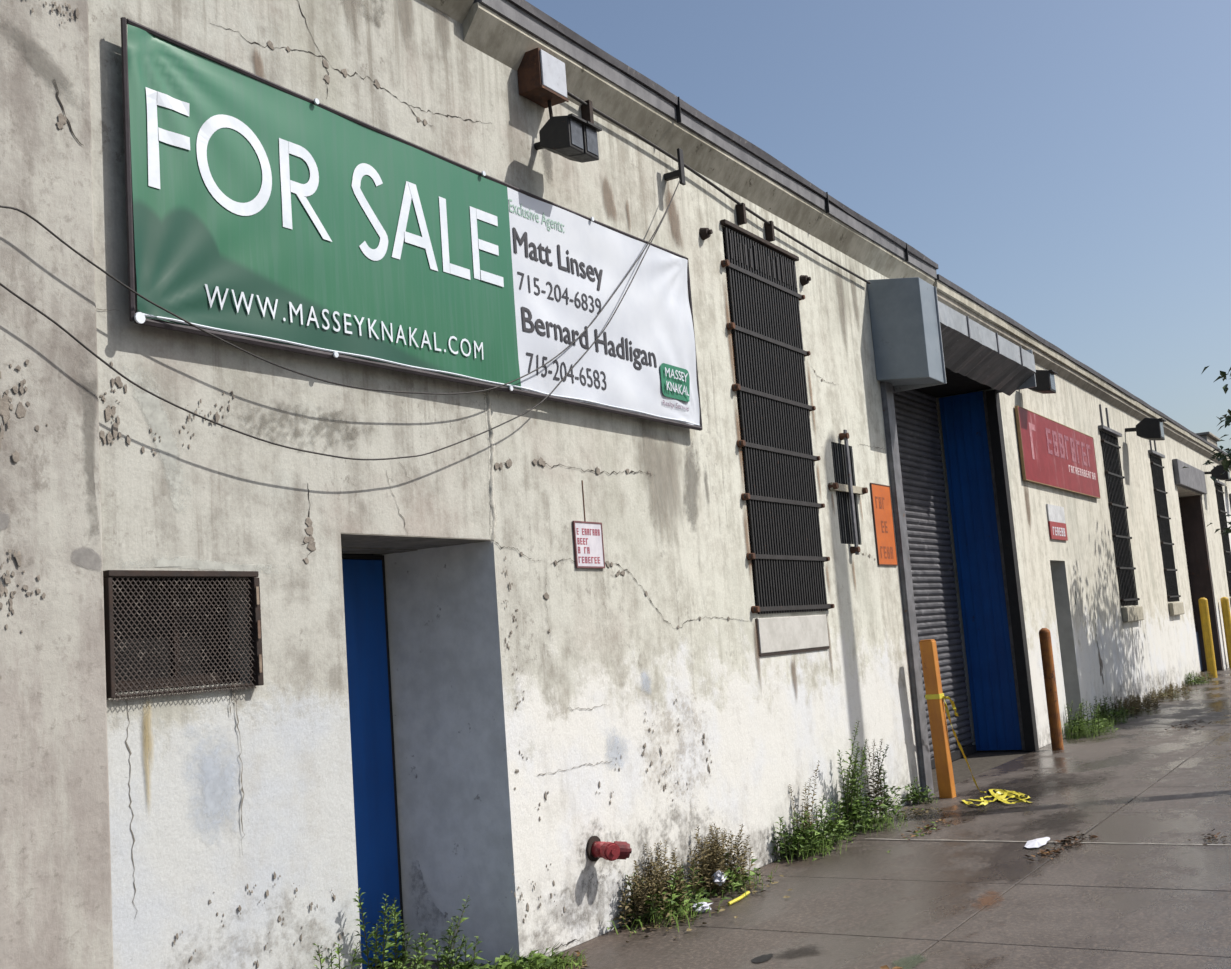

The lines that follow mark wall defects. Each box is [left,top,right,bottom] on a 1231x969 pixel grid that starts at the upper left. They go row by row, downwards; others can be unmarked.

crack [210,0,491,126]
crack [53,80,83,145]
spalling [0,359,48,463]
peeling [100,361,161,455]
peeling [179,391,235,449]
crack [495,457,652,476]
spalling [0,549,46,633]
crack [496,542,575,640]
crack [606,561,744,629]
crack [125,700,137,917]
corrosion [144,712,152,794]
crack [230,690,245,855]